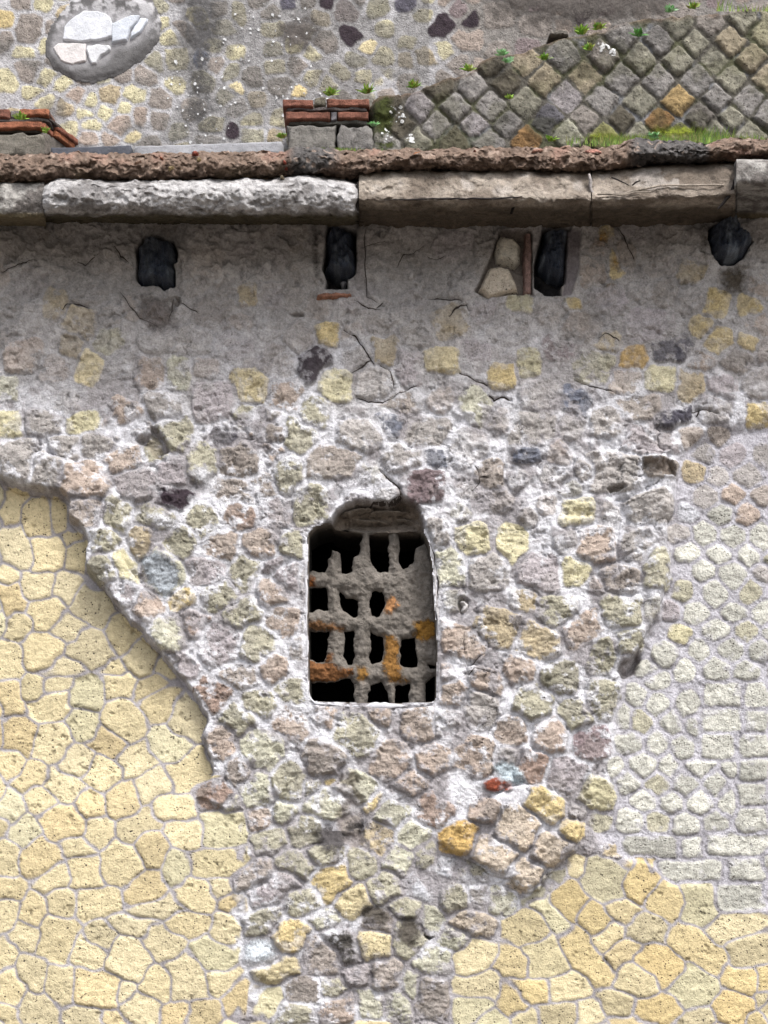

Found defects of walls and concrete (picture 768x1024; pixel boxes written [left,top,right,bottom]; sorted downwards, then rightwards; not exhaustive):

crack [355,235,443,310]
crack [430,298,468,316]
crack [344,330,416,404]
crack [459,373,510,402]
spalling [133,425,171,461]
spalling [606,482,628,493]
spalling [320,495,426,533]
spalling [457,594,470,615]
spalling [616,640,642,681]
spalling [332,768,367,852]